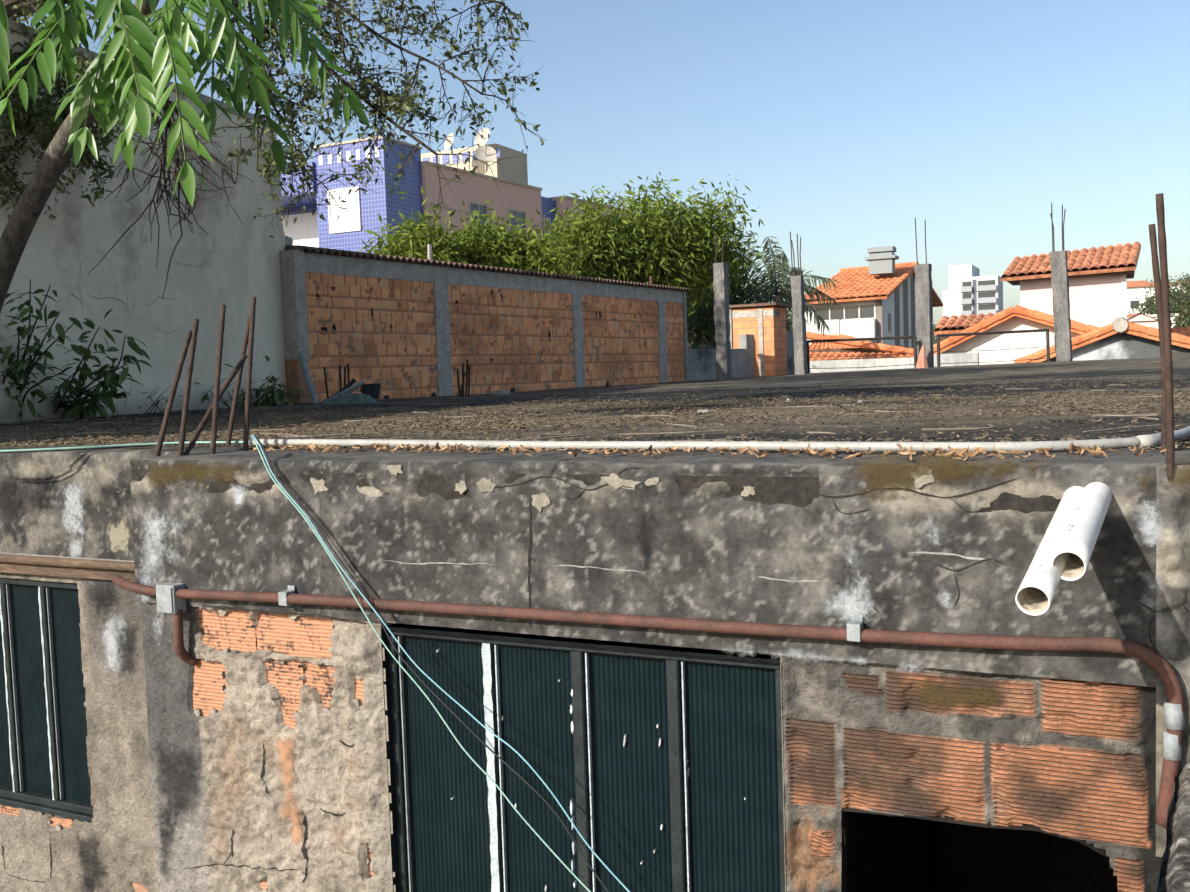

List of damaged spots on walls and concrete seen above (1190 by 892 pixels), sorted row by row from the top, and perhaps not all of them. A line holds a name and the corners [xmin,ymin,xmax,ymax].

efflorescence [63,485,84,557]
peeling [454,478,497,494]
peeling [532,492,551,513]
peeling [601,473,660,490]
peeling [741,486,755,496]
crack [817,476,1026,515]
spalling [193,607,335,729]
spalling [353,674,364,707]
crack [260,745,269,794]
damp [158,753,196,872]
damp [79,840,104,891]
crack [182,808,344,883]